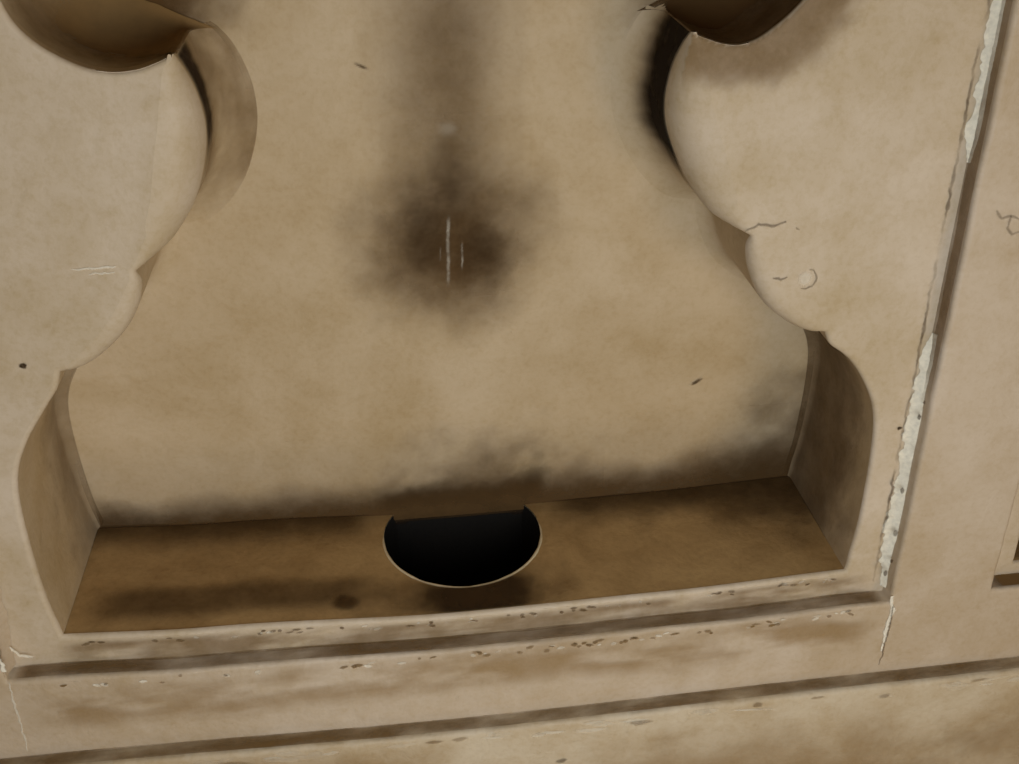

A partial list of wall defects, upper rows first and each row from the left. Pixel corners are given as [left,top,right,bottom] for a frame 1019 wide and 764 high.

crack [964,0,1006,163]
crack [878,333,938,651]
crack [0,588,33,751]